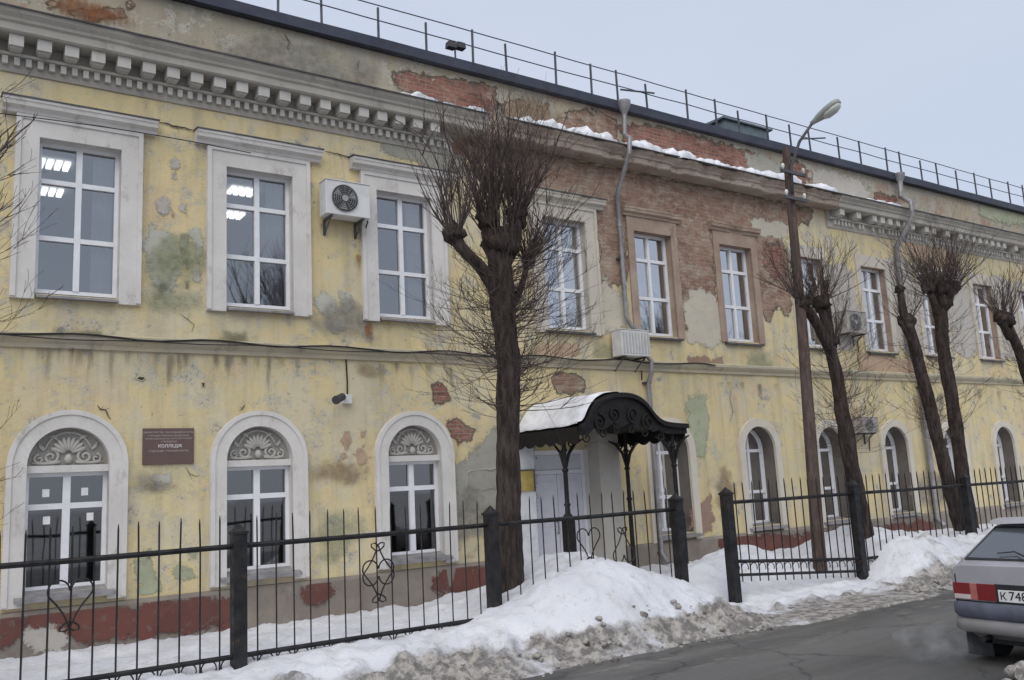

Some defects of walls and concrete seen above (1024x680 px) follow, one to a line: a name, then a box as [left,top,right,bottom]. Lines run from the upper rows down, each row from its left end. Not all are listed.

flaking render [45,0,135,22]
flaking render [391,67,758,169]
flaking render [380,137,814,364]
water stain [315,299,374,334]
flaking render [531,341,586,397]
flaking render [430,381,451,405]
peeling [338,430,371,466]
flaking render [445,417,478,446]
peeling [300,583,338,607]